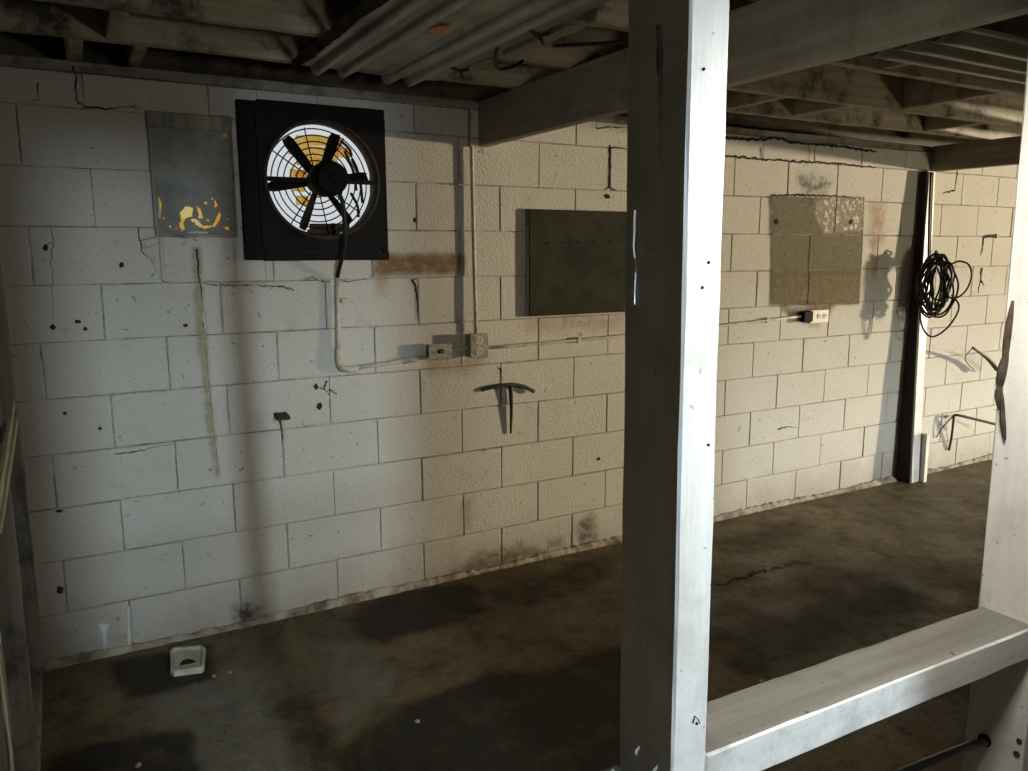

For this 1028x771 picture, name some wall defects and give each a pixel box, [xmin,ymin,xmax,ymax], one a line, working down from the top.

crack [72,66,141,110]
crack [725,136,877,168]
crack [138,227,169,282]
corrosion [376,255,463,274]
crack [715,561,811,586]